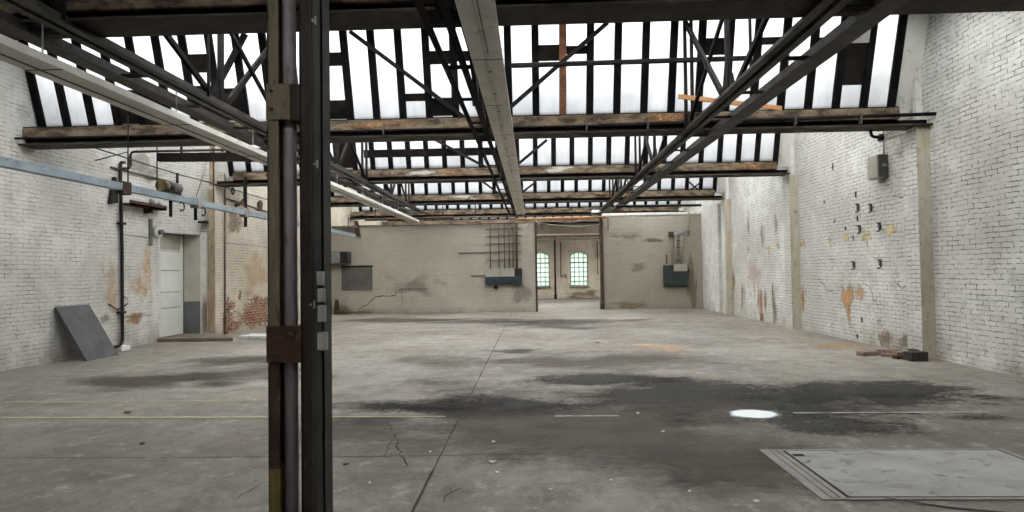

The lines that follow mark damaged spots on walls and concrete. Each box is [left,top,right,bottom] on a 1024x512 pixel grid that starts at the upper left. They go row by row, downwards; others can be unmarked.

peeling [214,290,268,334]
crack [384,423,409,466]
damp [332,395,864,498]